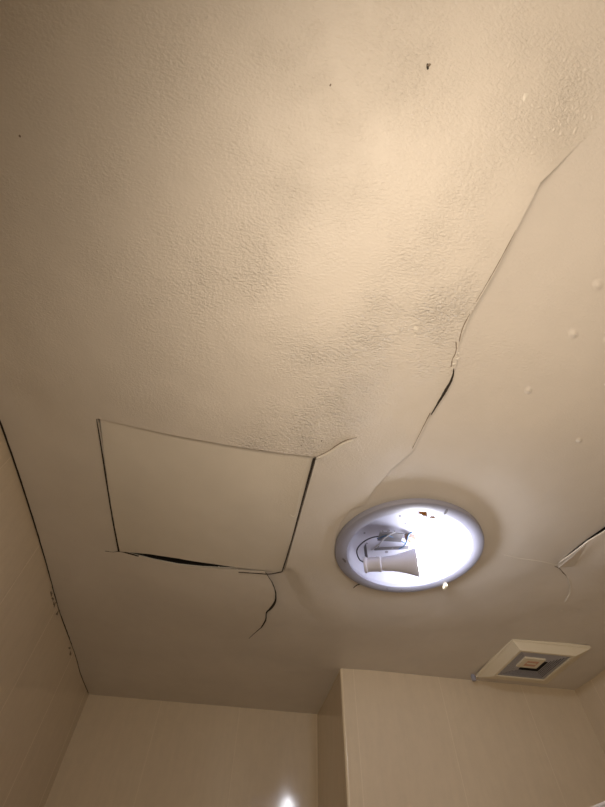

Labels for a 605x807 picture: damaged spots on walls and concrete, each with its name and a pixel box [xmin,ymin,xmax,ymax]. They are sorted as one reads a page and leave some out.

crack [413,230,516,447]
crack [96,419,357,634]
crack [506,527,605,602]